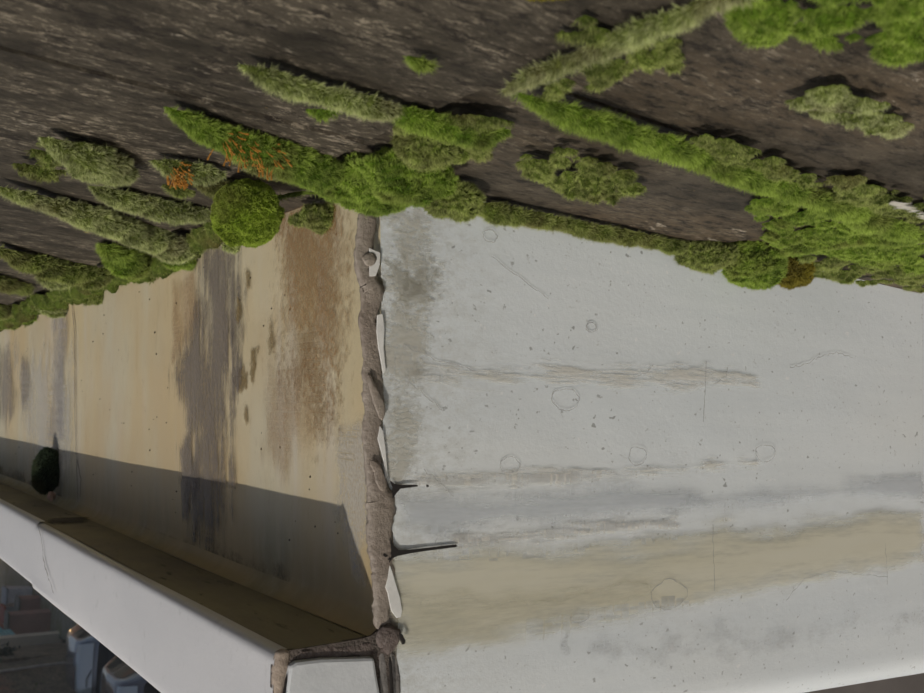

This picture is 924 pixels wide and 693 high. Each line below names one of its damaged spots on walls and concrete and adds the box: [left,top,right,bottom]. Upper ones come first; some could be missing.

damp [176,246,246,549]
damp [400,578,688,637]